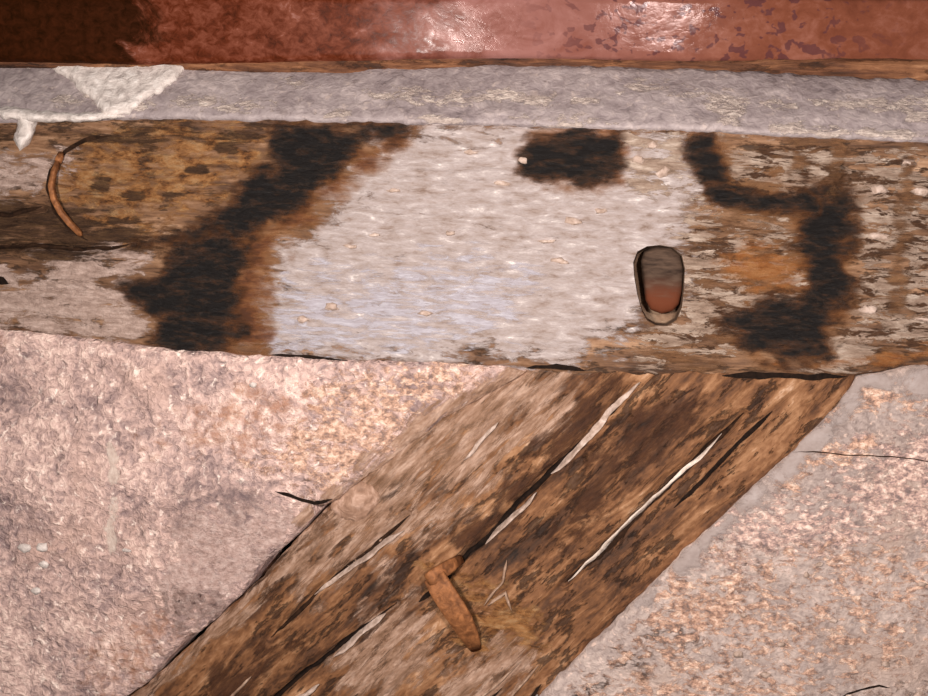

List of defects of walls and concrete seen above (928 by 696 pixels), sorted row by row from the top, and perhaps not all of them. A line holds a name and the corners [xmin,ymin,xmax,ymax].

leakage [55,121,203,143]
corrosion [55,119,268,237]
leakage [731,139,857,203]
leakage [888,142,918,313]
leakage [257,124,809,554]
crack [275,491,332,505]
crack [448,382,640,579]
crack [564,411,772,583]
leakage [206,630,308,696]
crack [274,603,396,696]
crack [271,515,410,637]
corrosion [450,572,547,656]